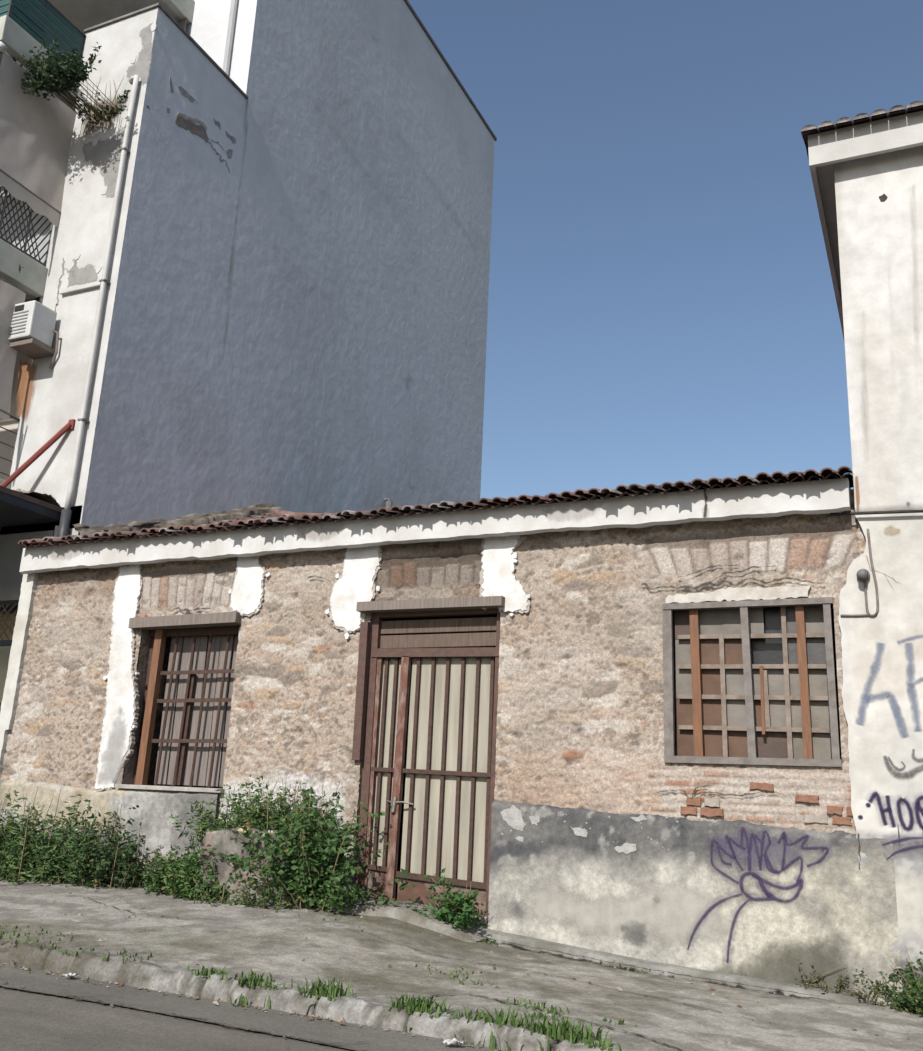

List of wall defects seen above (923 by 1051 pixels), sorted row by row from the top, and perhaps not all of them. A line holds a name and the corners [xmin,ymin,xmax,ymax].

flaking render [127,23,157,85]
flaking render [83,119,126,197]
spalling [166,107,236,159]
crack [701,489,709,517]
flaking render [228,556,272,617]
flaking render [325,546,383,640]
flaking render [479,535,531,617]
flaking render [94,564,143,792]
peeling [500,805,540,842]
peeling [613,814,669,854]
damp [627,926,644,943]
damp [717,944,850,991]